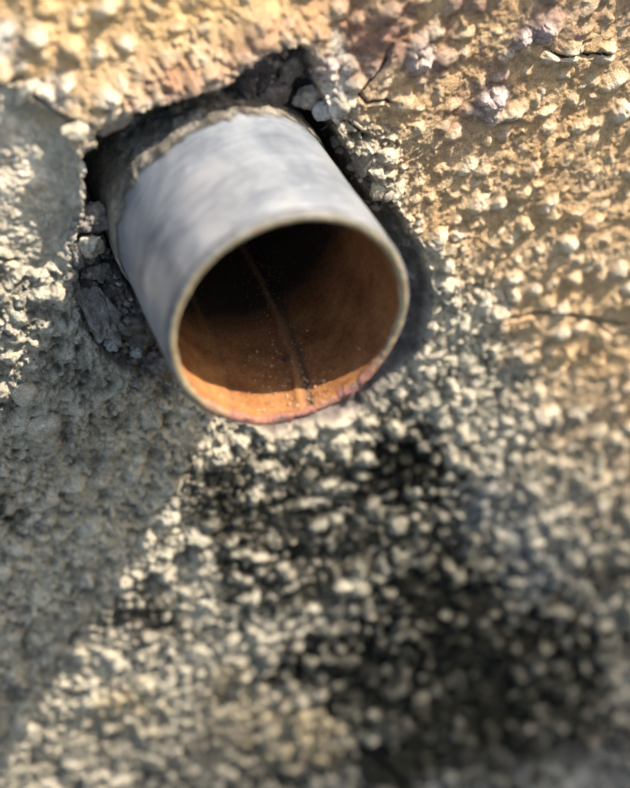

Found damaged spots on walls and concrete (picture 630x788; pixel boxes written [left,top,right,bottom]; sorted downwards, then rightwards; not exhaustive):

spalling [0,37,440,443]
damp [116,599,183,645]
damp [156,410,630,788]